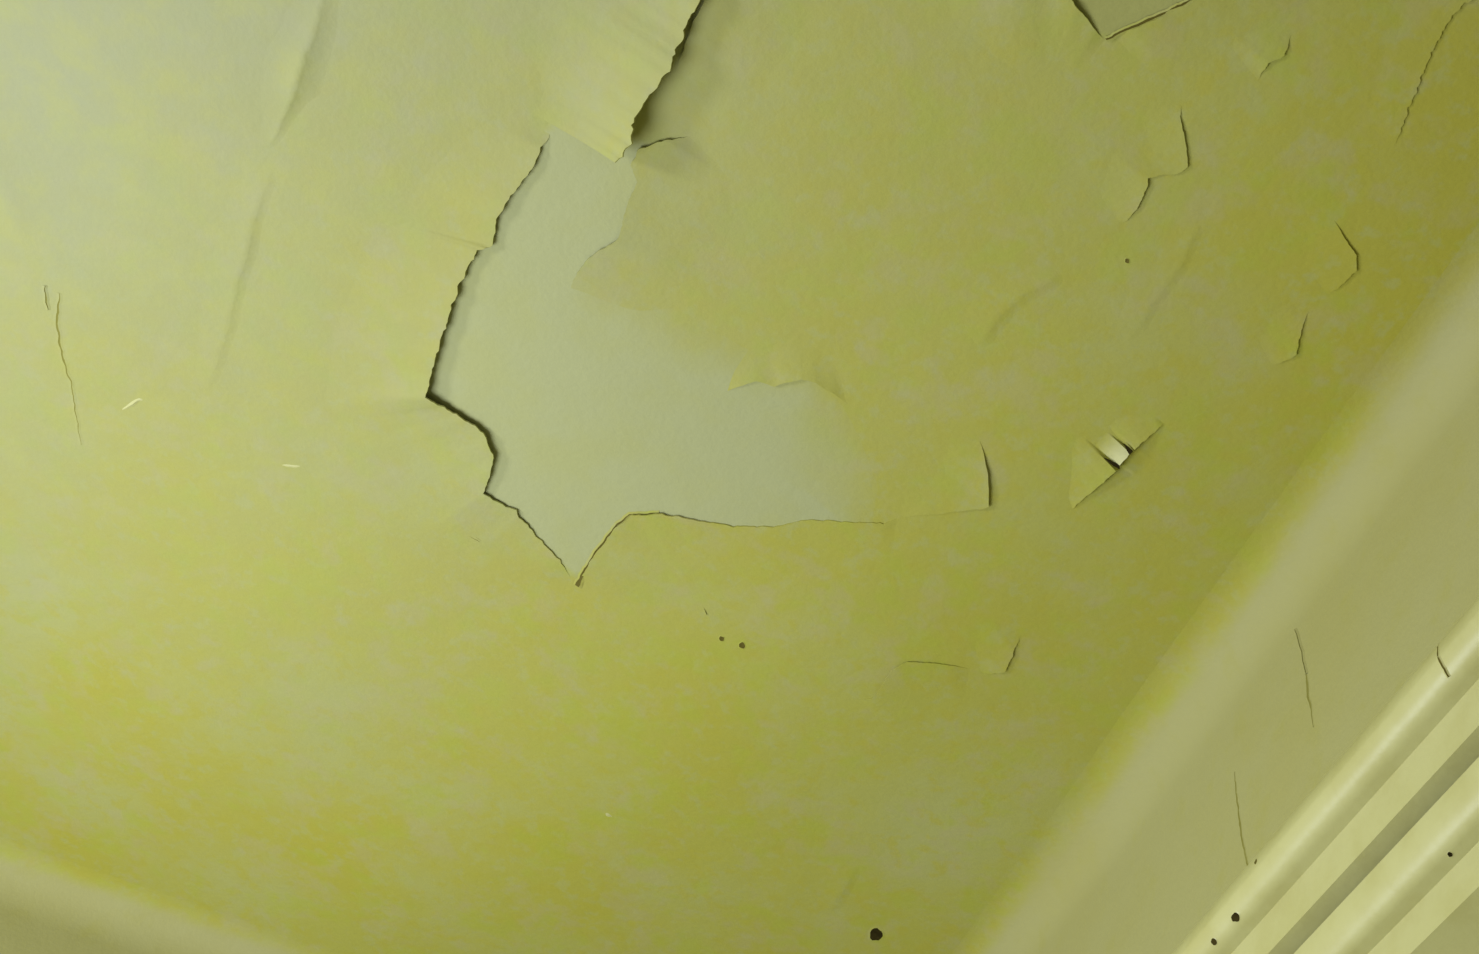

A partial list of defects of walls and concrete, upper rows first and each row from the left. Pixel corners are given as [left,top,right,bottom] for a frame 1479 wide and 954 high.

crack [42,286,84,445]
peeling [324,0,989,615]